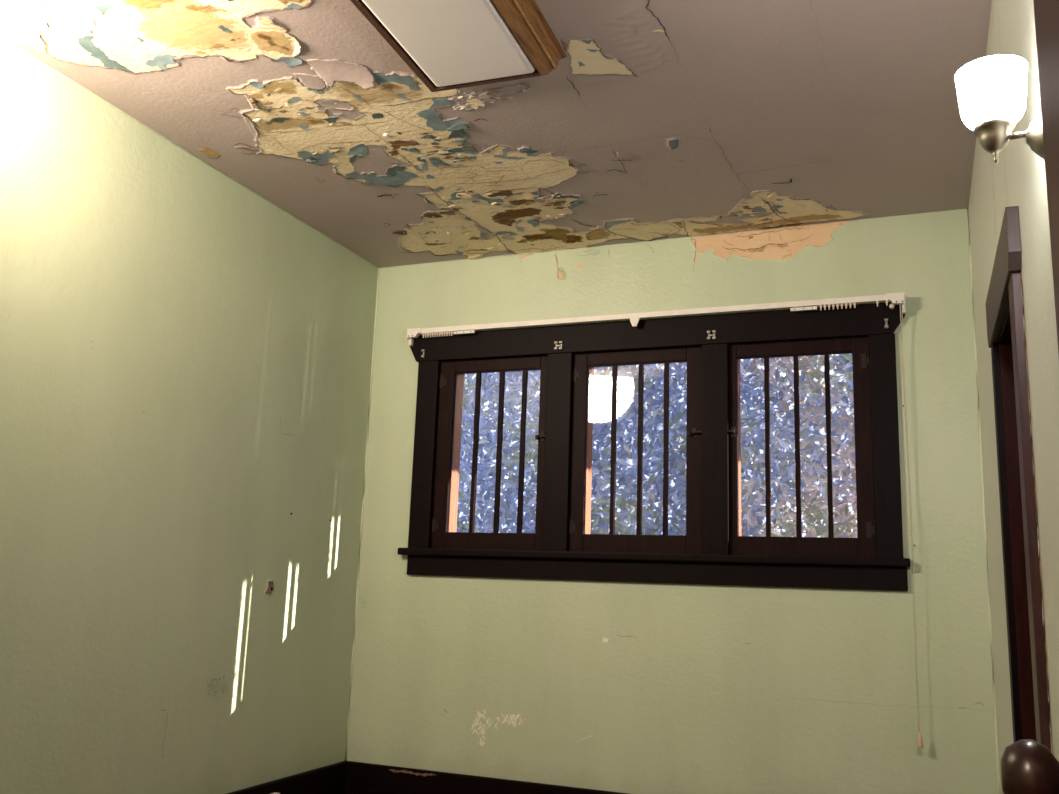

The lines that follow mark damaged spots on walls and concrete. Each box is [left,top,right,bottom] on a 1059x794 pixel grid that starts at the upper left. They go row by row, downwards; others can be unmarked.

peeling [34,0,871,282]
crack [646,0,798,223]